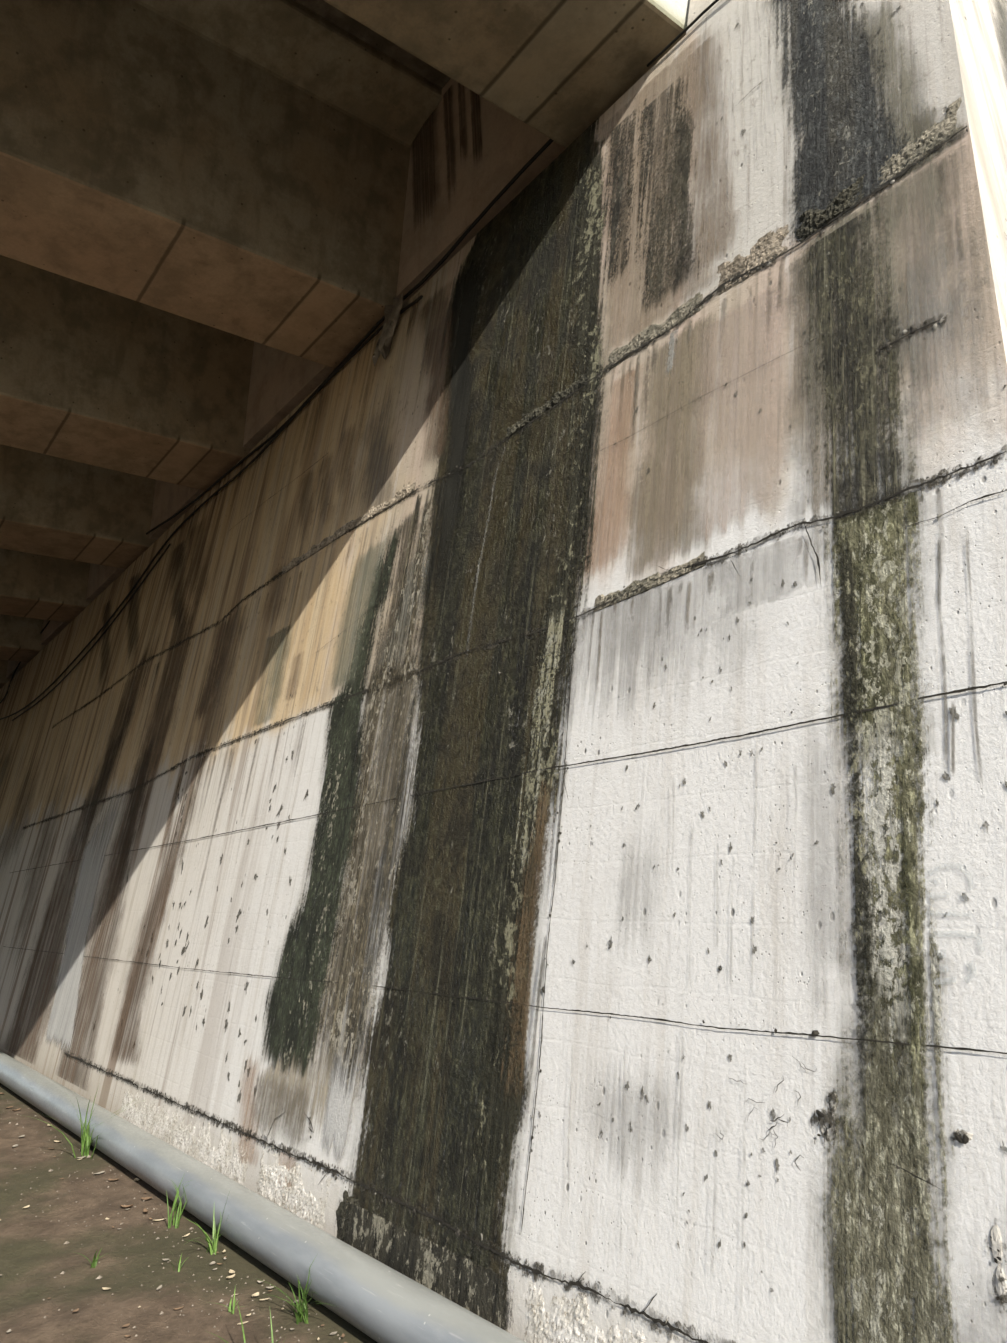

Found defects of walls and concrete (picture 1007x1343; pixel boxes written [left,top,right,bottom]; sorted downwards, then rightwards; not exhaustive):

leakage [5,539,202,1087]
leakage [258,40,719,1323]
crack [3,444,1007,1343]
crack [53,126,968,728]
leakage [773,0,958,1343]
leakage [972,652,981,774]